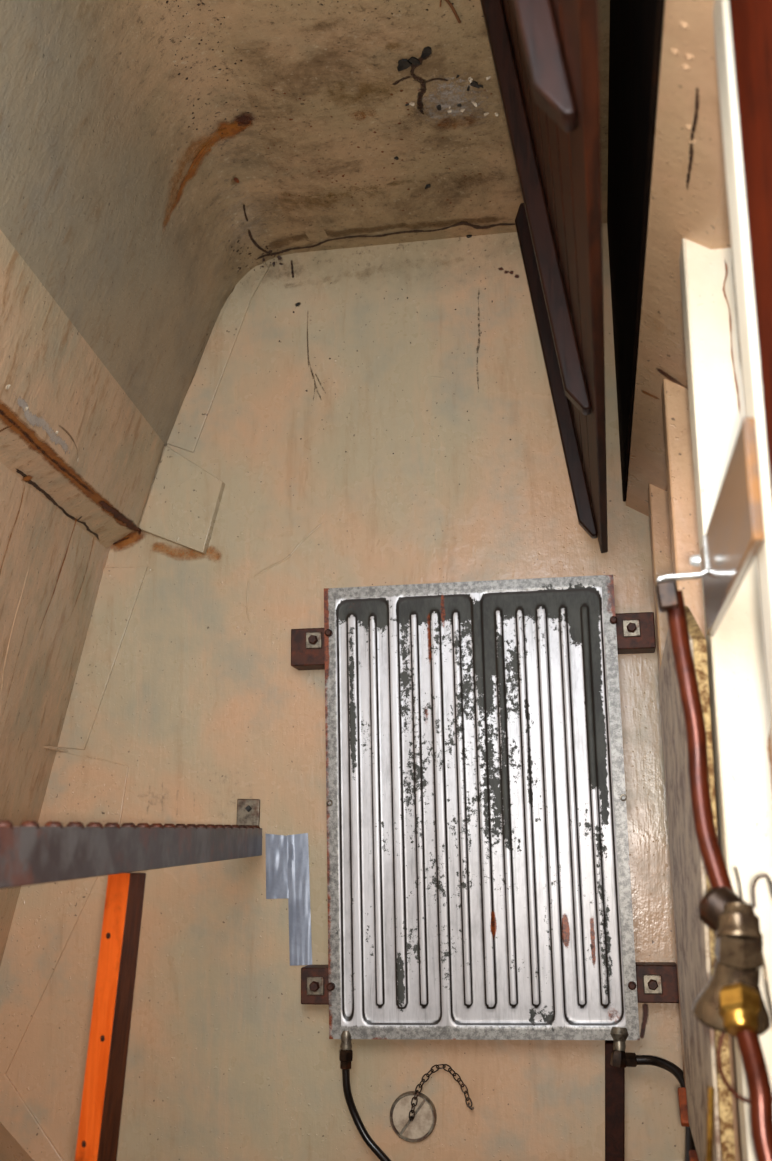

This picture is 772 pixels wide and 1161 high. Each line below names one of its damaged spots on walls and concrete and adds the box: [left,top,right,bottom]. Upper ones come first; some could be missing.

water stain [165,0,259,135]
crack [393,46,448,114]
rust [164,113,254,224]
crack [686,88,699,187]
crack [243,204,515,277]
crack [16,469,99,539]
rust [0,403,143,549]